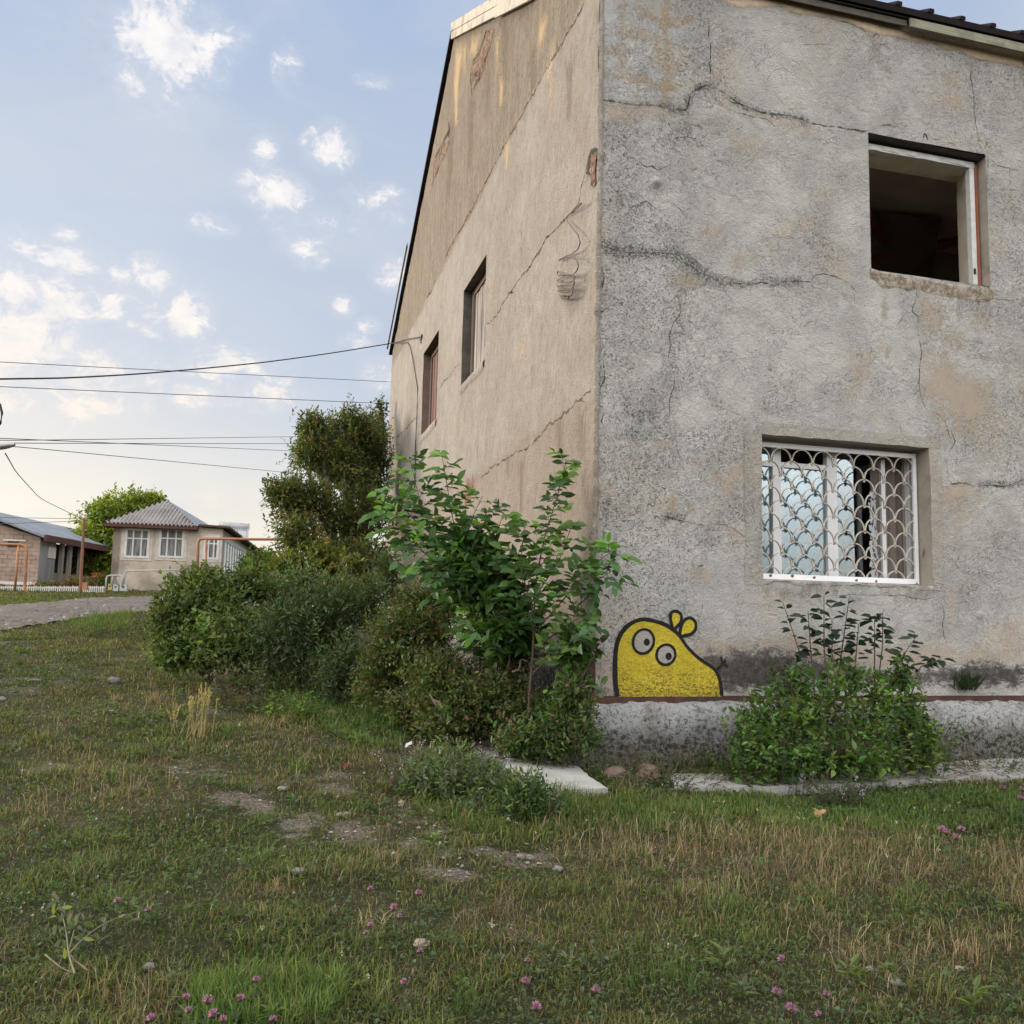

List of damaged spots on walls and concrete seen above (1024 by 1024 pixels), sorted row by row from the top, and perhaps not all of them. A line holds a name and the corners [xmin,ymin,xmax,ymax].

flaking render [470,28,494,96]
crack [427,3,584,297]
flaking render [585,147,597,186]
crack [603,26,898,170]
crack [487,175,585,324]
crack [604,242,857,463]
crack [477,390,591,478]
leakage [695,625,1024,693]